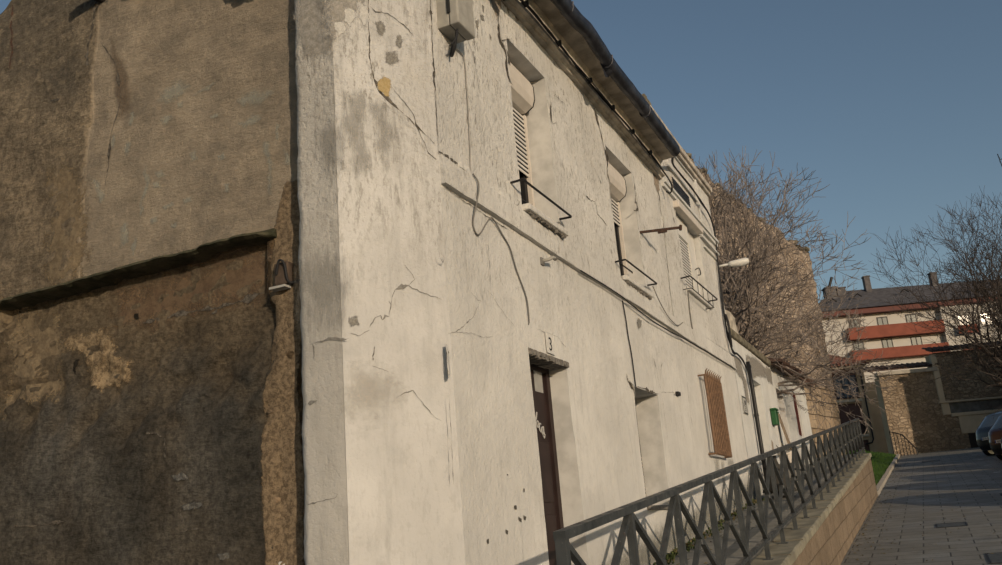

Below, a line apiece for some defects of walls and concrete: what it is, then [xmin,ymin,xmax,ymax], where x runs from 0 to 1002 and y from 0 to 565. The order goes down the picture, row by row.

peeling [294,0,385,57]
spalling [385,35,403,64]
crack [363,0,520,378]
spalling [0,296,133,420]
crack [312,265,440,372]
crack [400,390,454,481]